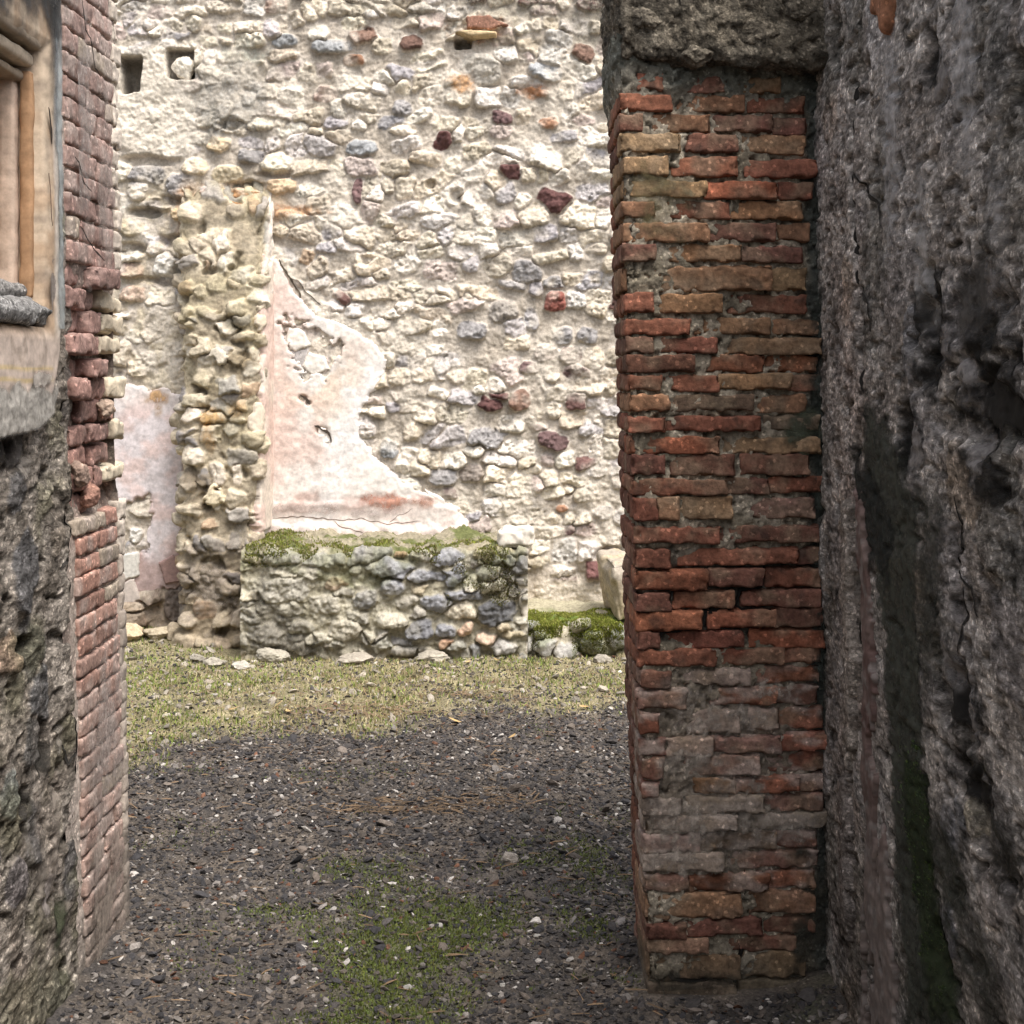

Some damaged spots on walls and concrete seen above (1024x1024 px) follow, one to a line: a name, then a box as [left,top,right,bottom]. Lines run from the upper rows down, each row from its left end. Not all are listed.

crack [852,87,860,135]
crack [852,172,882,332]
flaking render [0,259,226,602]
flaking render [208,254,469,536]
crack [859,369,871,431]
crack [954,497,978,654]